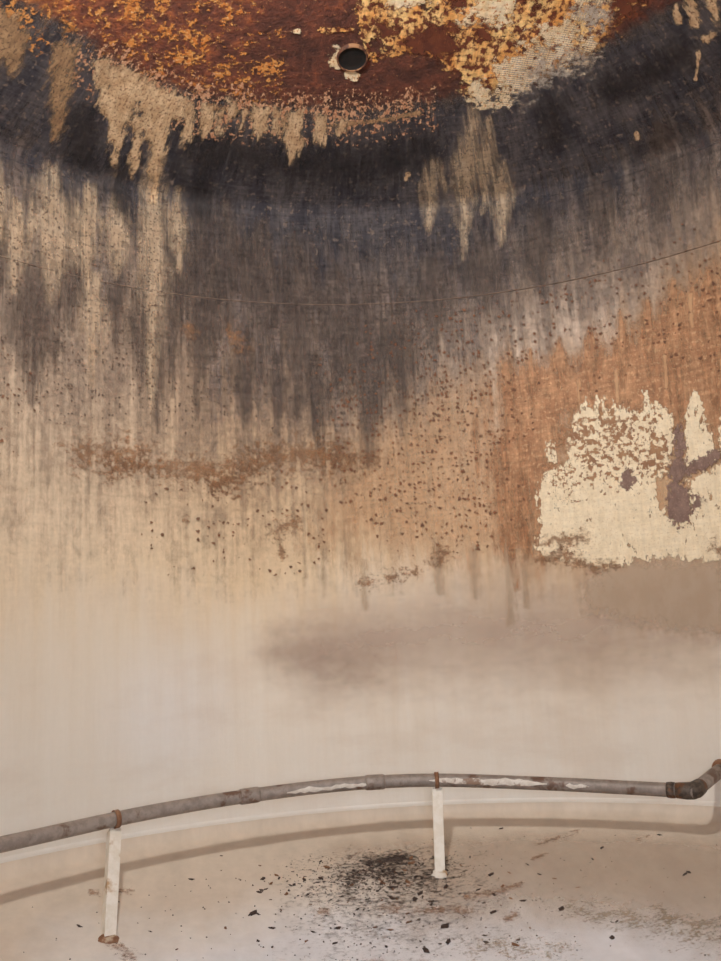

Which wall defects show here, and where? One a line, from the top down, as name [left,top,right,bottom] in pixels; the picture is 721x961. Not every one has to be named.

peeling [328,44,360,82]
corrosion [317,0,381,62]
peeling [369,0,648,113]
peeling [672,0,719,81]
corrosion [332,111,421,127]
water stain [0,93,721,474]
corrosion [473,269,721,573]
corrosion [60,430,380,499]
peeling [532,389,721,569]
water stain [329,843,721,917]